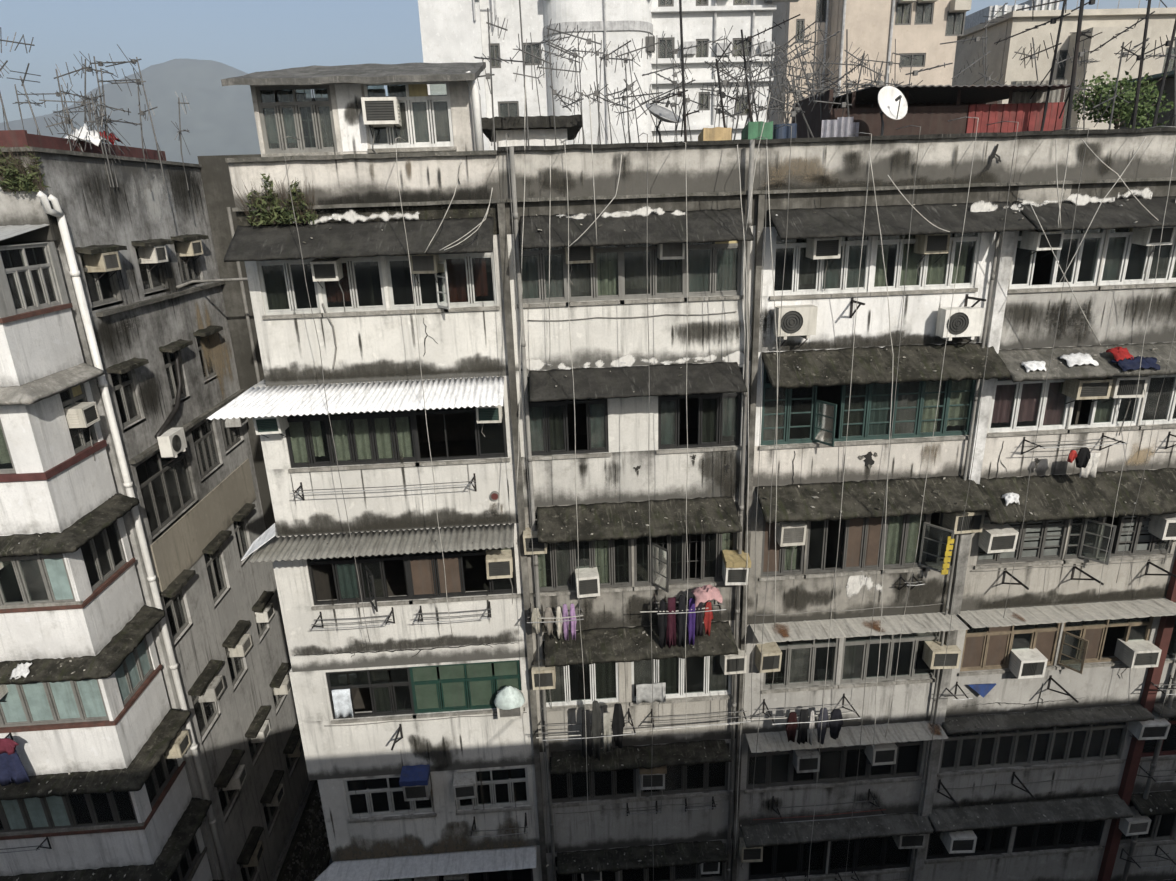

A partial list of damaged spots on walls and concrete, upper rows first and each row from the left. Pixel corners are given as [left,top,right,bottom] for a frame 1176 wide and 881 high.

damp [345,98,362,124]
damp [82,168,203,223]
damp [319,161,491,209]
damp [757,142,996,190]
damp [1004,300,1105,340]
damp [1121,292,1176,323]
damp [262,355,504,382]
damp [783,587,835,611]
peeling [846,575,882,597]
damp [878,576,949,606]
damp [402,736,463,807]
damp [334,786,525,861]